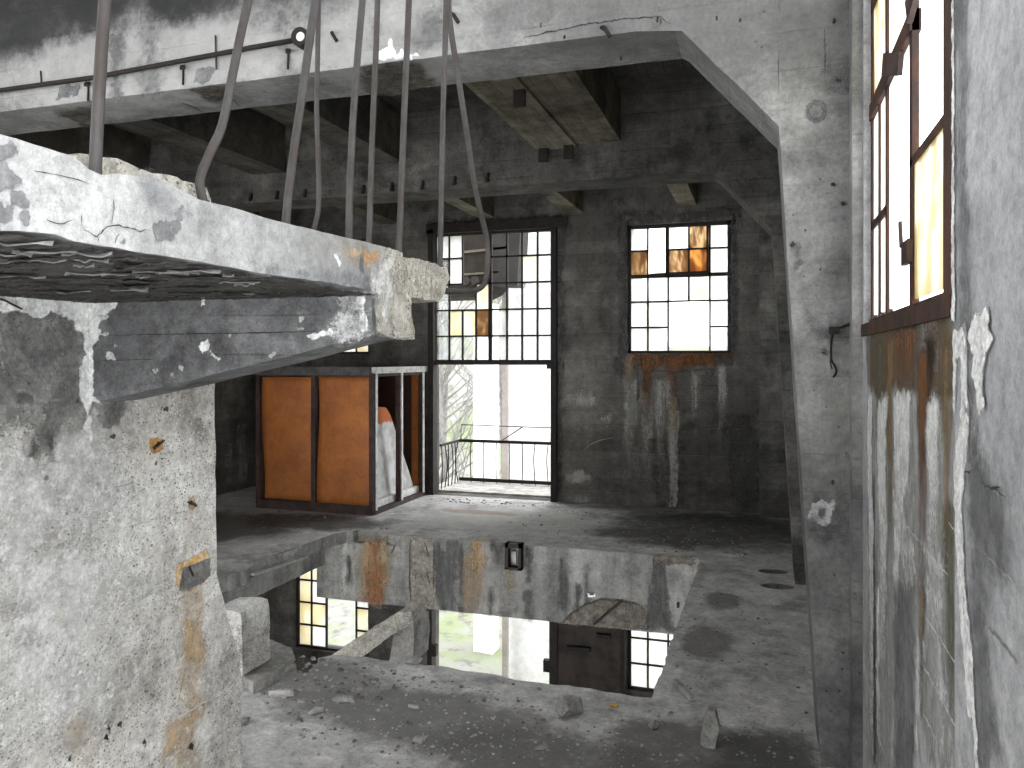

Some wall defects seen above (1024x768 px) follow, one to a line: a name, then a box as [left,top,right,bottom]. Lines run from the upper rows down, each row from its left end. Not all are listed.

crack [525,16,671,37]
peeling [0,141,30,226]
crack [47,200,150,243]
peeling [0,239,260,307]
water stain [613,207,741,507]
rust [626,353,733,426]
peeling [950,0,993,768]
rust [866,317,955,687]
crack [964,470,1005,497]
rust [341,540,391,604]
water stain [867,390,955,768]
water stain [966,430,1006,768]